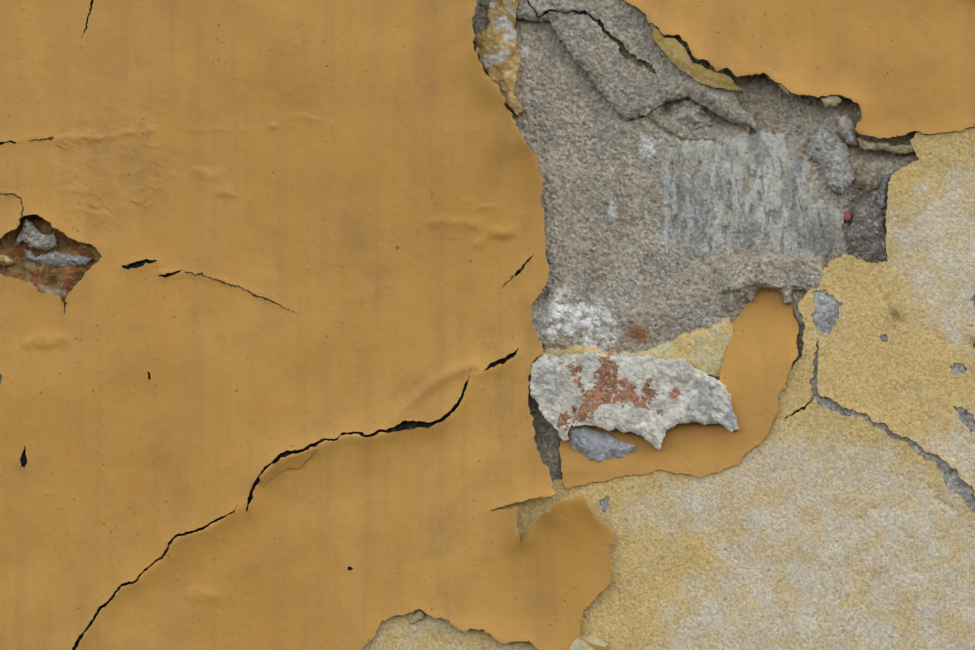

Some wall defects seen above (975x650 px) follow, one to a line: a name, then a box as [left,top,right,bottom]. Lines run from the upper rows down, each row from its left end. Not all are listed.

crack [0,136,54,145]
spalling [0,215,102,303]
crack [122,259,296,313]
peeling [472,0,975,650]
crack [785,341,975,511]
crack [72,349,518,650]
peeling [363,609,538,650]